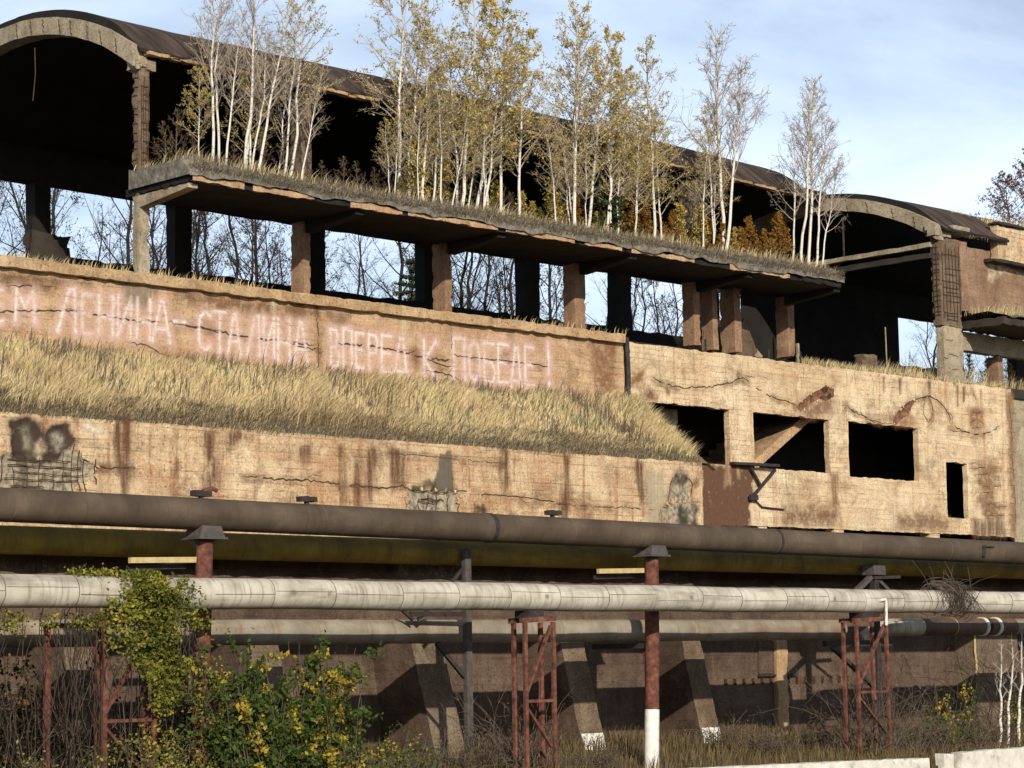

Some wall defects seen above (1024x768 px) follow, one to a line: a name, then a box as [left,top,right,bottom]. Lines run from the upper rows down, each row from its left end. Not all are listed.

crack [0,285,548,380]
crack [655,375,794,404]
spalling [796,385,834,411]
spalling [0,416,100,492]
corrosion [114,415,130,493]
corrosion [205,433,215,487]
crack [244,475,410,490]
corrosion [354,451,375,505]
corrosion [391,448,404,485]
spalling [404,487,463,512]
spalling [662,473,701,525]
crack [849,392,1017,520]